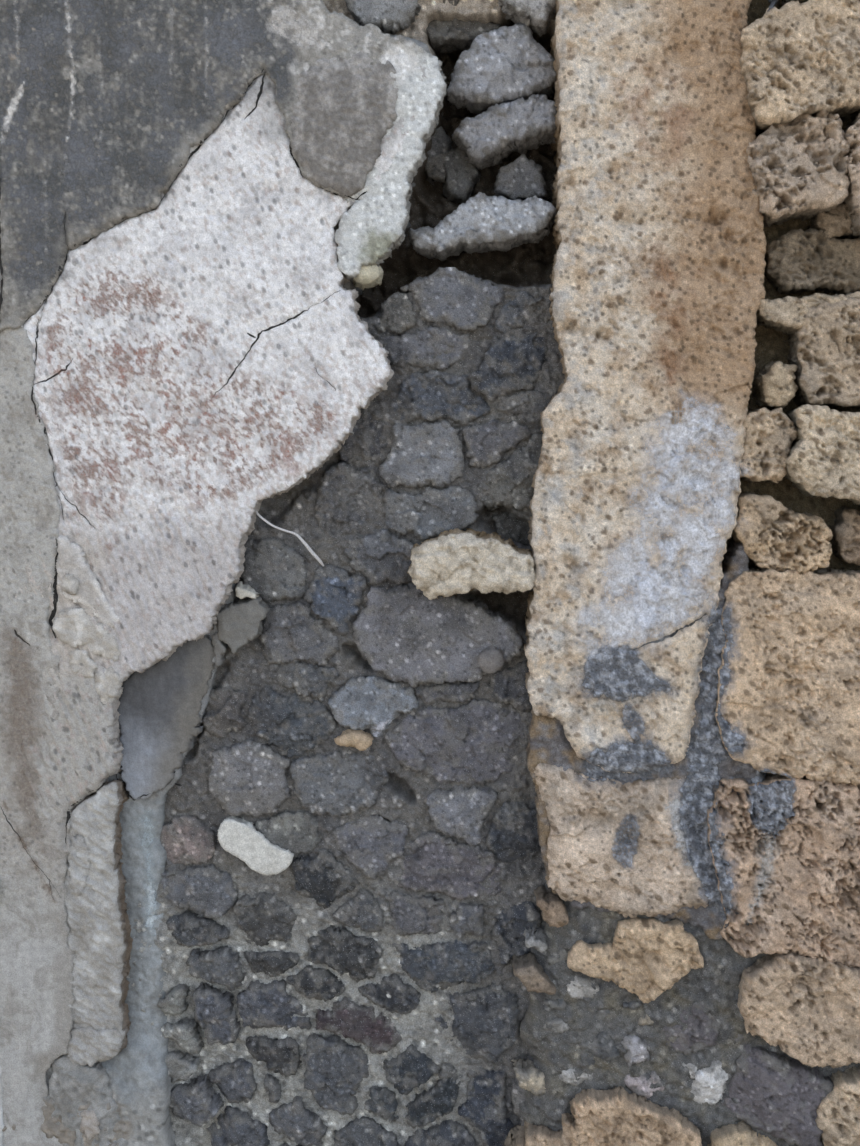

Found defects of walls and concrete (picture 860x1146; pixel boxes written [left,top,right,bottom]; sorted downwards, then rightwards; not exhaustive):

crack [0,182,8,310]
crack [14,69,265,646]
crack [212,290,341,398]
crack [0,806,56,898]
crack [65,765,182,843]
peeling [47,535,270,1146]